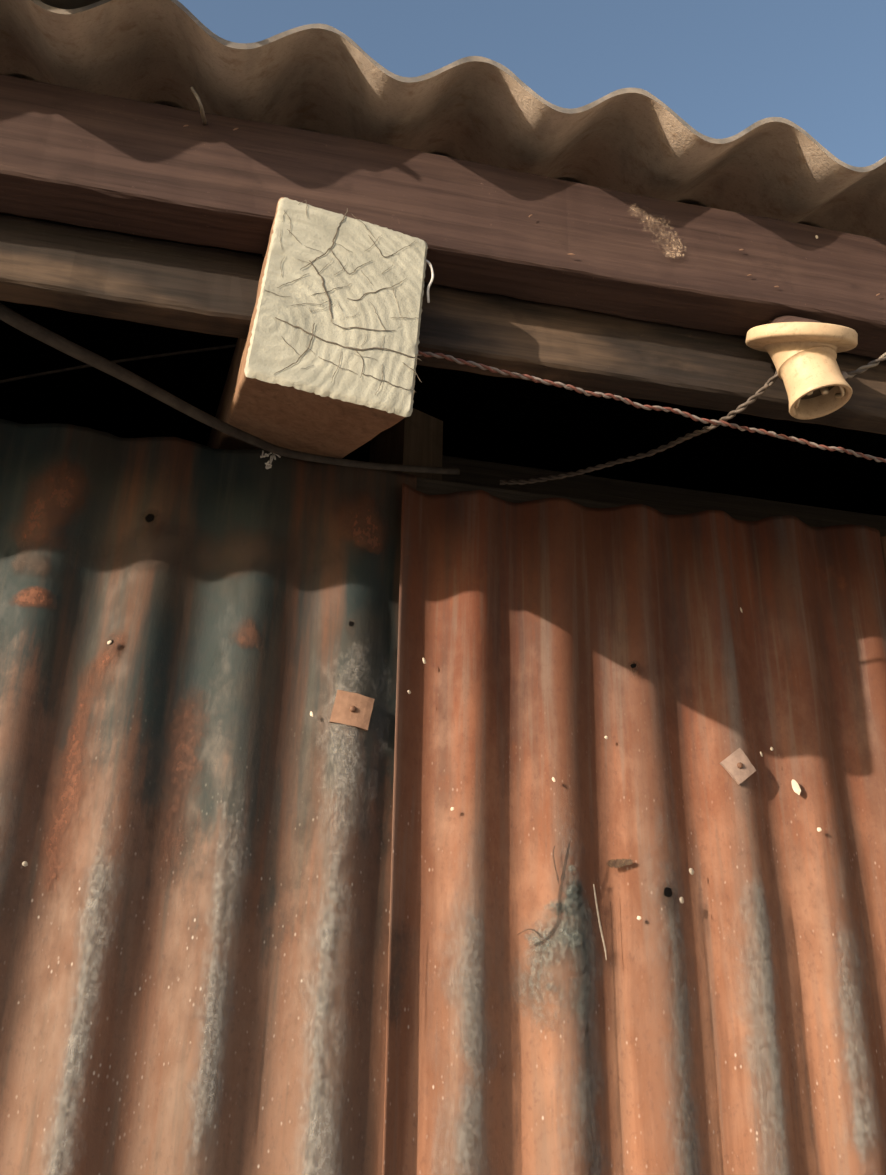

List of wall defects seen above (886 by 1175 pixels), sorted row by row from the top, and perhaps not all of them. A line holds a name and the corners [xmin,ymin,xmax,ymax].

crack [266,200,422,395]
rust [15,587,47,606]